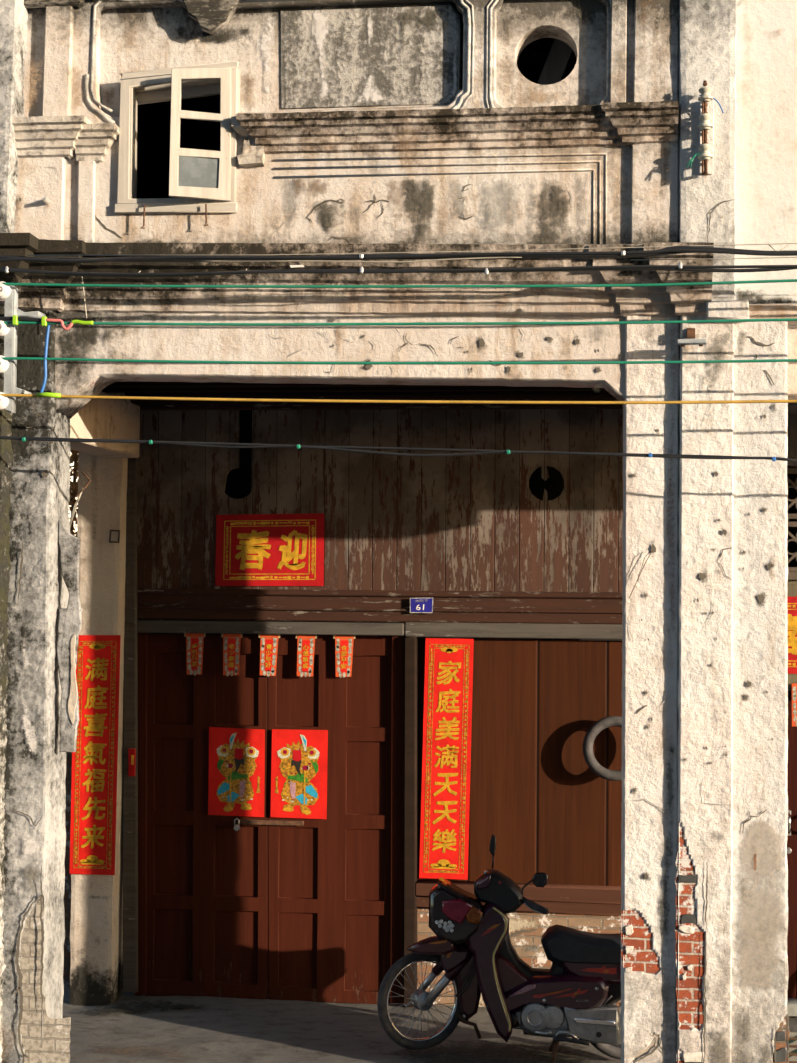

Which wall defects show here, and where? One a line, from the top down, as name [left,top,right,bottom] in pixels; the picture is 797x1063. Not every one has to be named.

water stain [312,11,329,98]
water stain [398,9,437,52]
water stain [357,75,398,104]
water stain [530,183,568,244]
spalling [620,910,660,974]
spalling [675,822,719,1038]
spalling [19,898,71,1063]
spalling [634,1035,659,1060]
spalling [676,1049,704,1063]